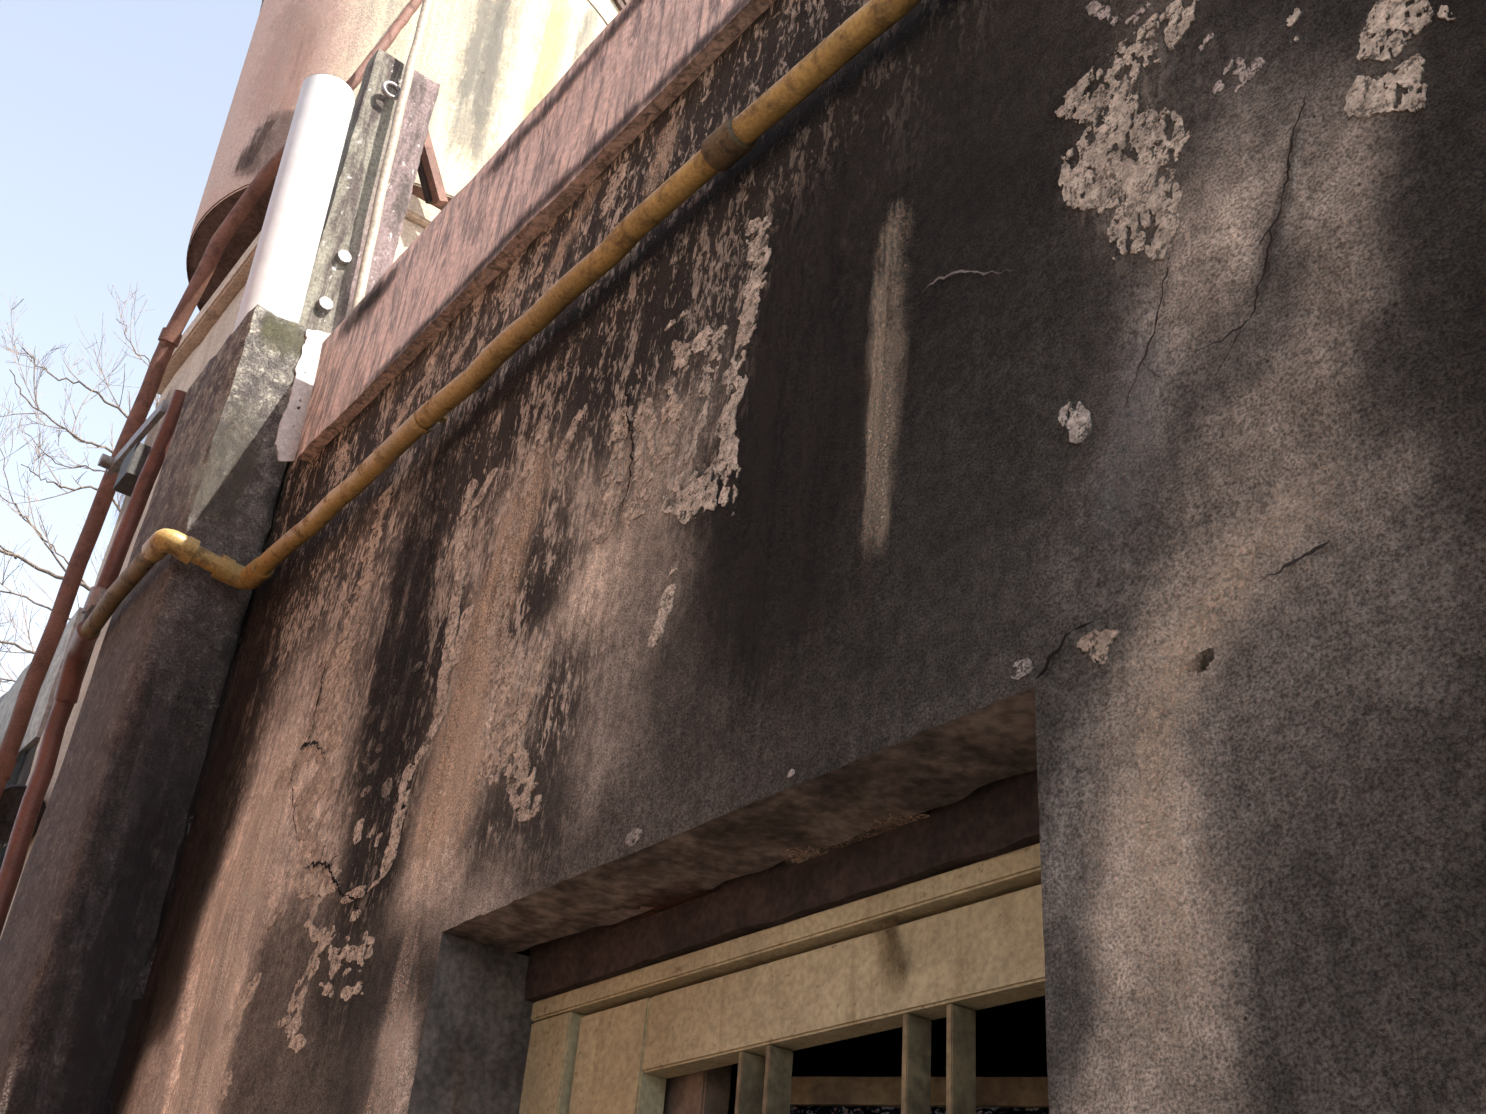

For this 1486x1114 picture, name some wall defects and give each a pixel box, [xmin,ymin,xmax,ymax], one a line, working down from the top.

peeling [1055,0,1199,261]
peeling [1213,57,1265,94]
peeling [1286,8,1301,43]
peeling [1344,0,1456,119]
water stain [339,263,399,334]
crack [1118,90,1308,424]
peeling [391,328,475,433]
water stain [357,0,964,854]
peeling [585,216,772,545]
flaking render [1058,401,1092,444]
flaking render [1077,629,1119,665]
peeling [266,403,588,1054]